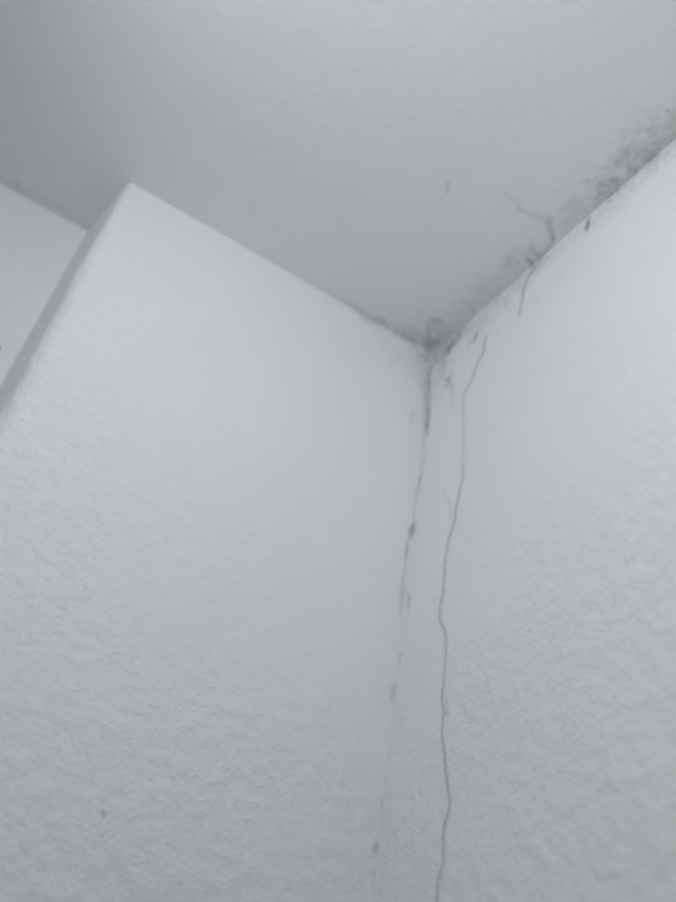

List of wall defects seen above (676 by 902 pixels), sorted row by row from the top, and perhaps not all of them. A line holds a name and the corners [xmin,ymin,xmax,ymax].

water stain [293,75,676,415]
crack [397,333,490,902]